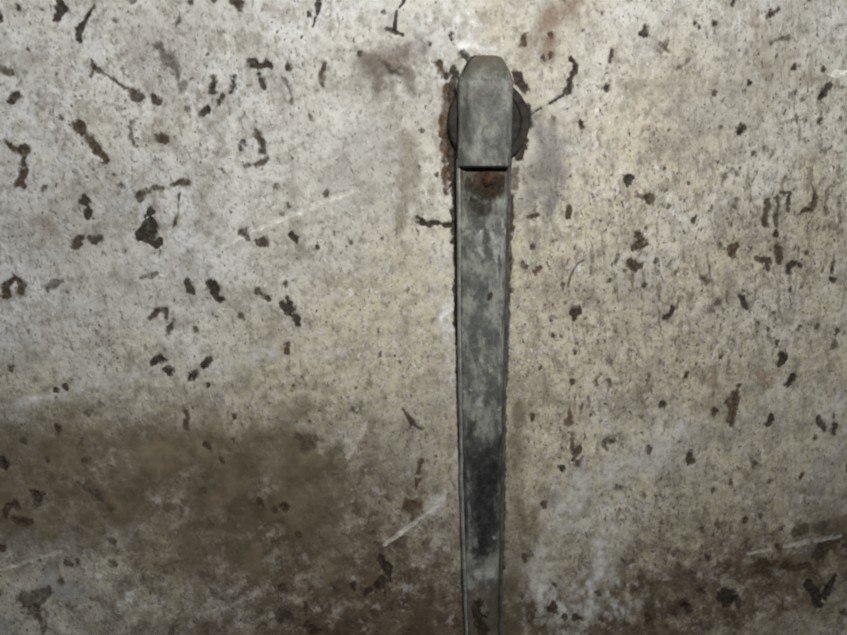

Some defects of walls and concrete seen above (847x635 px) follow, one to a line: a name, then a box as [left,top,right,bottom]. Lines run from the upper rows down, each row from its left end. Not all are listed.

corrosion [435,59,451,195]
leakage [108,424,340,540]
leakage [554,523,617,625]